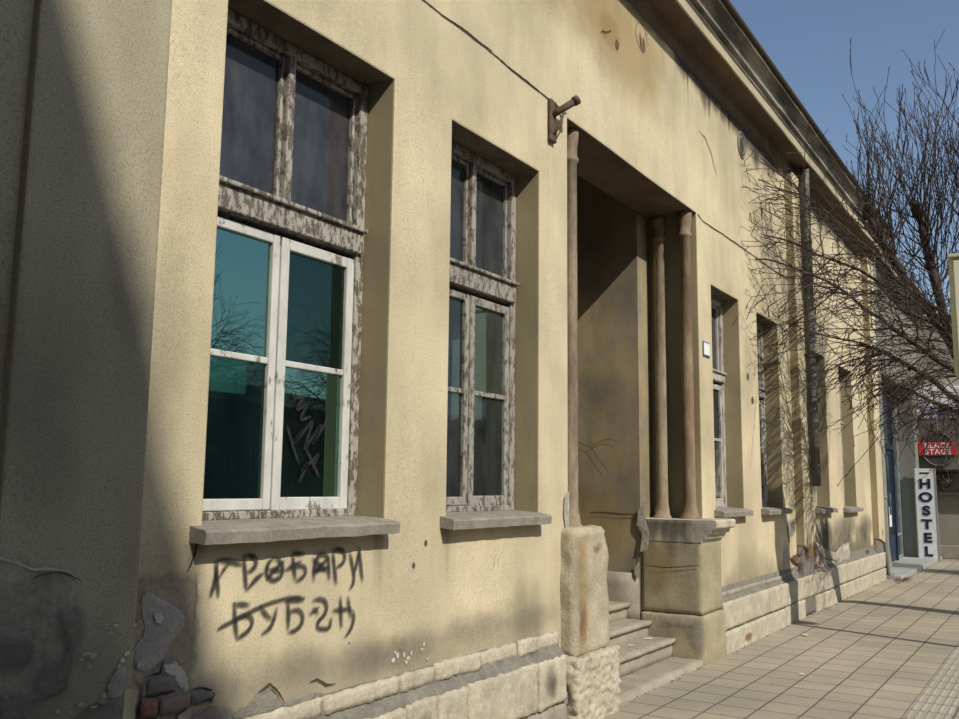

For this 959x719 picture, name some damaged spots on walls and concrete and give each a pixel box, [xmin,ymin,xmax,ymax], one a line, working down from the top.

water stain [675,53,779,171]
crack [187,544,198,618]
crack [578,487,637,515]
spalling [635,503,649,579]
crack [641,552,700,586]
peeling [810,494,850,567]
flaking render [137,657,215,719]